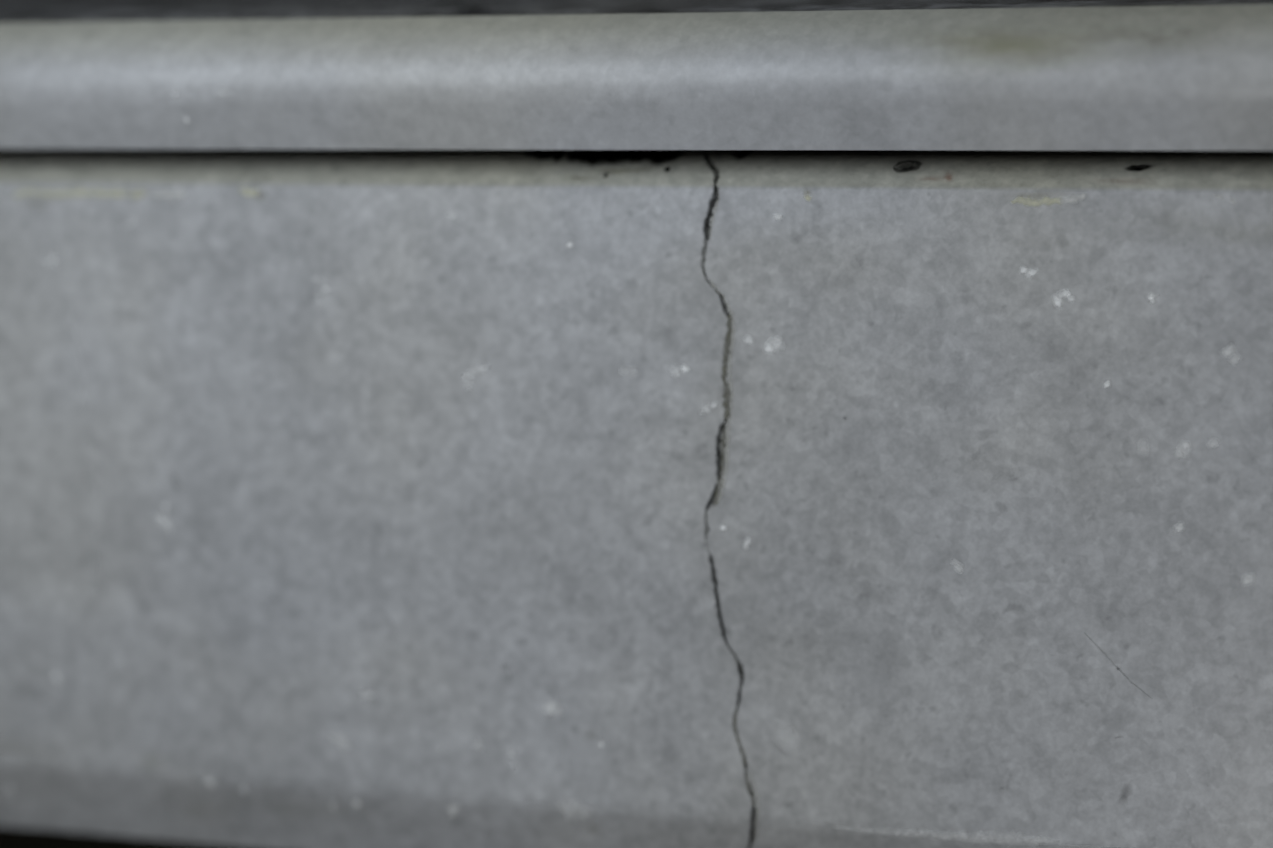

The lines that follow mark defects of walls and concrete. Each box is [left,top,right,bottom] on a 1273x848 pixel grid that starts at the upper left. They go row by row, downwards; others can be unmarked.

crack [702,154,755,848]